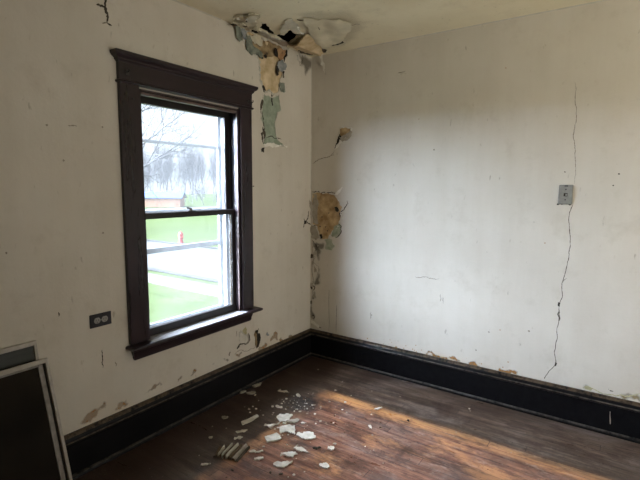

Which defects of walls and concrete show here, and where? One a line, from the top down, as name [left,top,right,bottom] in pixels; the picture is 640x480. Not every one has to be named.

crack [96,0,112,27]
spalling [231,13,360,152]
crack [571,84,579,184]
spalling [309,187,348,250]
peeling [236,327,269,353]
crack [544,205,573,379]